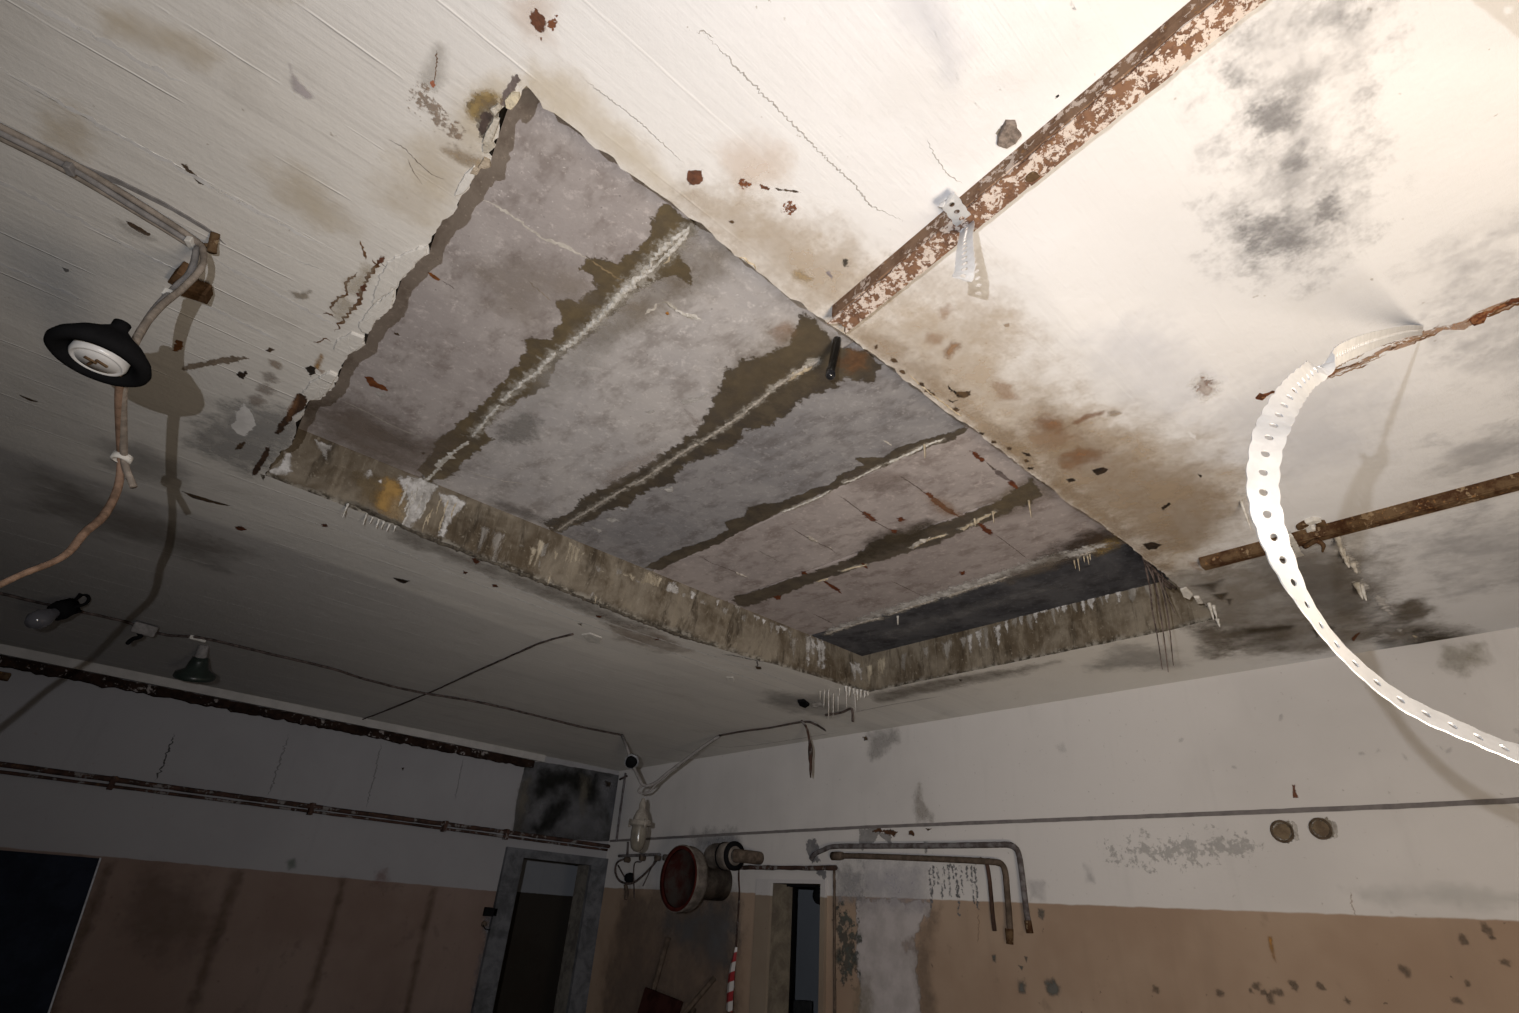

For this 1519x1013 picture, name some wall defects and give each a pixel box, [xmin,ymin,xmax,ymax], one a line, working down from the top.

spalling [449,74,520,196]
crack [698,30,903,222]
peeling [182,245,427,475]
crack [316,241,386,343]
crack [483,200,622,280]
spalling [874,345,970,412]
corrosion [1327,297,1519,380]
damp [507,313,899,581]
damp [623,363,1209,669]
corrosion [924,492,959,517]
corrosion [972,451,1018,489]
damp [832,873,862,986]